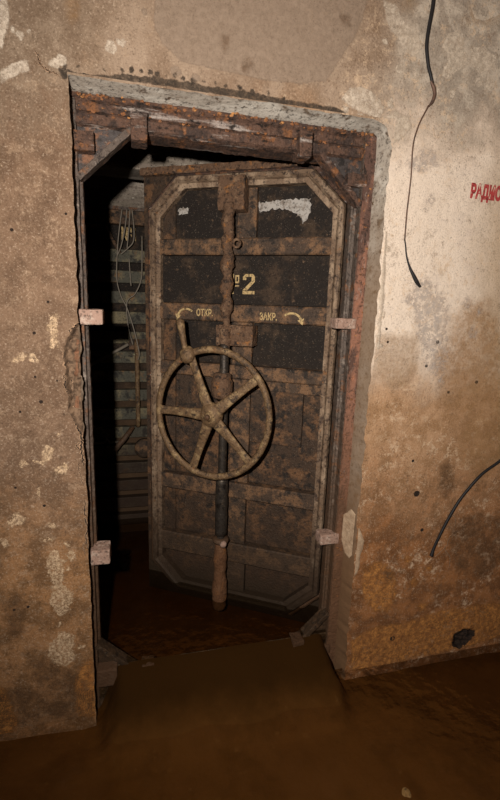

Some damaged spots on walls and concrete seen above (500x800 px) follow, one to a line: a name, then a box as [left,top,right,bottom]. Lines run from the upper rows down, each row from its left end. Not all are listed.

spalling [56,320,83,432]
water stain [19,445,54,468]
water stain [0,522,94,724]
spalling [452,629,475,649]